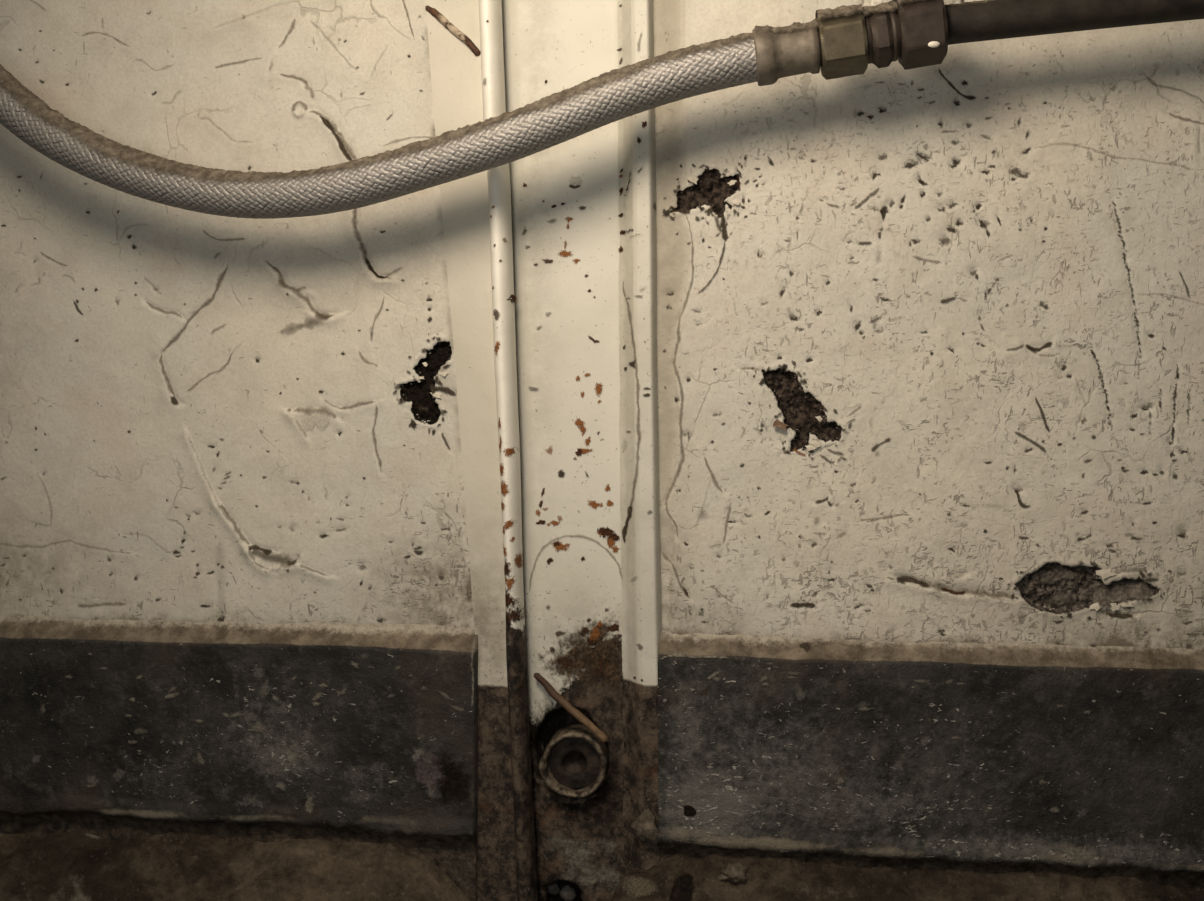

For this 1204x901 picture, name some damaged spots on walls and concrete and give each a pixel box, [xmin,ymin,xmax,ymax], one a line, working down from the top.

crack [280,23,356,160]
spalling [662,155,774,248]
crack [147,231,242,405]
crack [266,261,332,332]
crack [353,209,388,304]
spalling [393,296,456,449]
corrosion [573,418,600,477]
spalling [743,356,860,473]
corrosion [498,418,527,624]
corrosion [597,526,620,553]
spalling [999,544,1172,624]
corrosion [540,609,643,690]